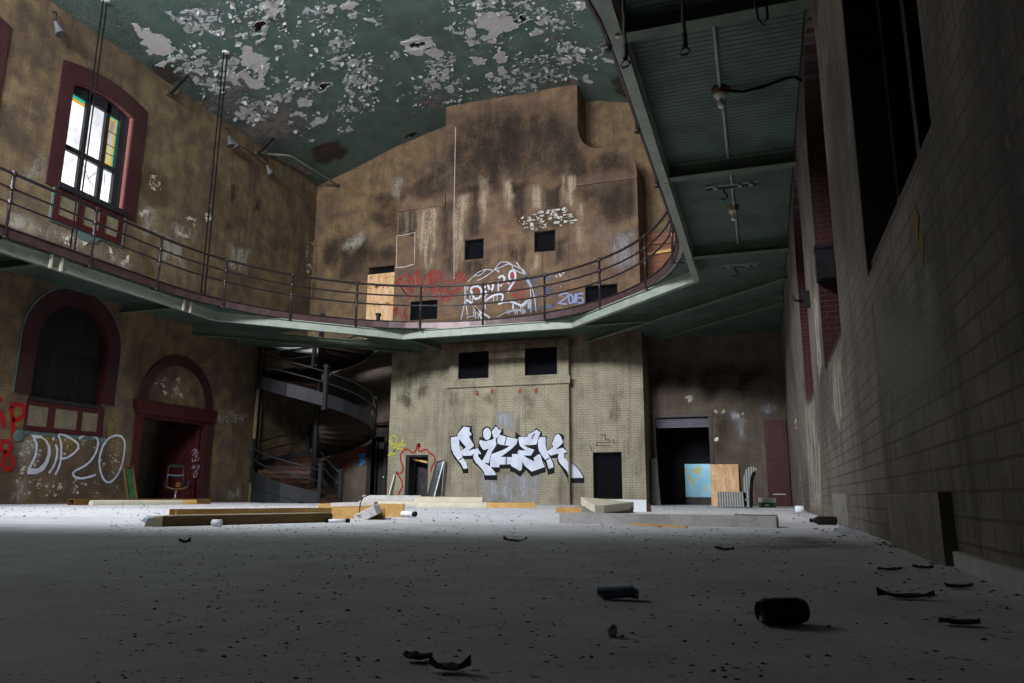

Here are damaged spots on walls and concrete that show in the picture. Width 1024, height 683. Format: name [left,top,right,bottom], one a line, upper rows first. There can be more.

flaking render [133,0,383,163]
peeling [386,0,614,109]
leakage [405,178,488,274]
leakage [505,176,583,242]
spalling [517,207,578,230]
leakage [614,237,635,262]